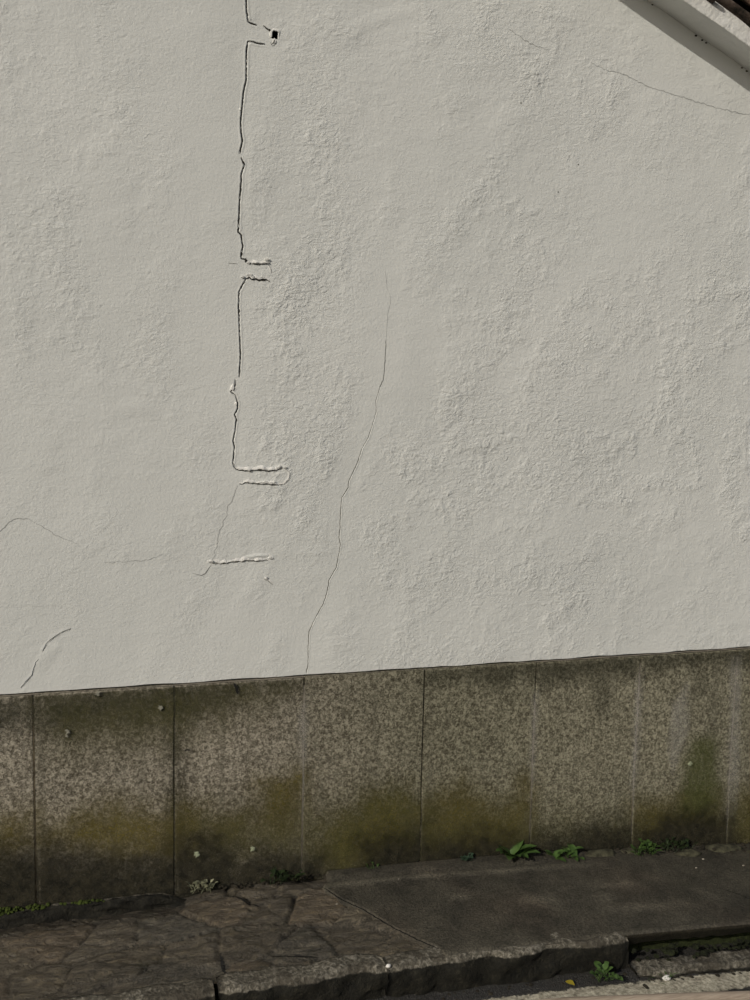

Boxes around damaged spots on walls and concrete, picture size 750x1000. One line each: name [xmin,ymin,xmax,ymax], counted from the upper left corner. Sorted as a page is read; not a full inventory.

crack [193,0,271,576]
crack [306,273,391,674]
crack [20,627,71,688]
leakage [0,784,322,912]
leakage [360,815,737,867]